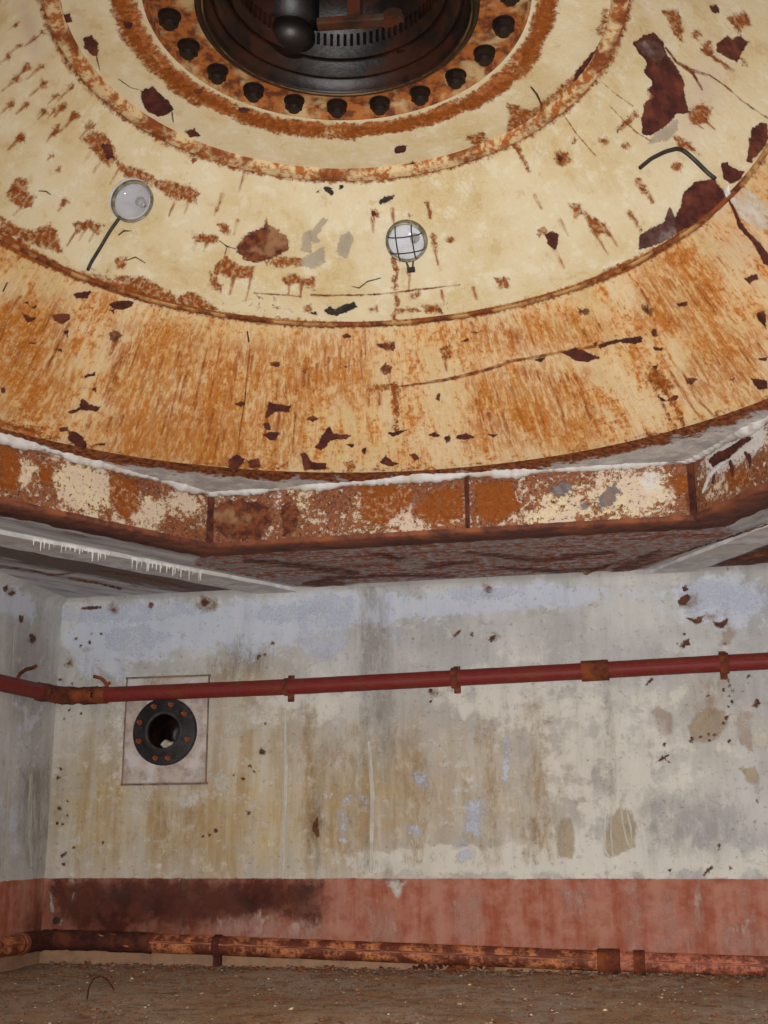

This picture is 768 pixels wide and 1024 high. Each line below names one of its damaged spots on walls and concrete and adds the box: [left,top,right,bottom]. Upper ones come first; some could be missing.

peeling [121,81,174,123]
corrosion [109,0,555,141]
peeling [616,32,689,144]
corrosion [41,84,199,212]
peeling [638,122,768,250]
spalling [235,218,354,269]
corrosion [702,436,753,493]
damp [33,537,110,562]
damp [130,556,203,581]
corrosion [243,524,768,587]
damp [311,811,321,837]
damp [367,741,375,873]